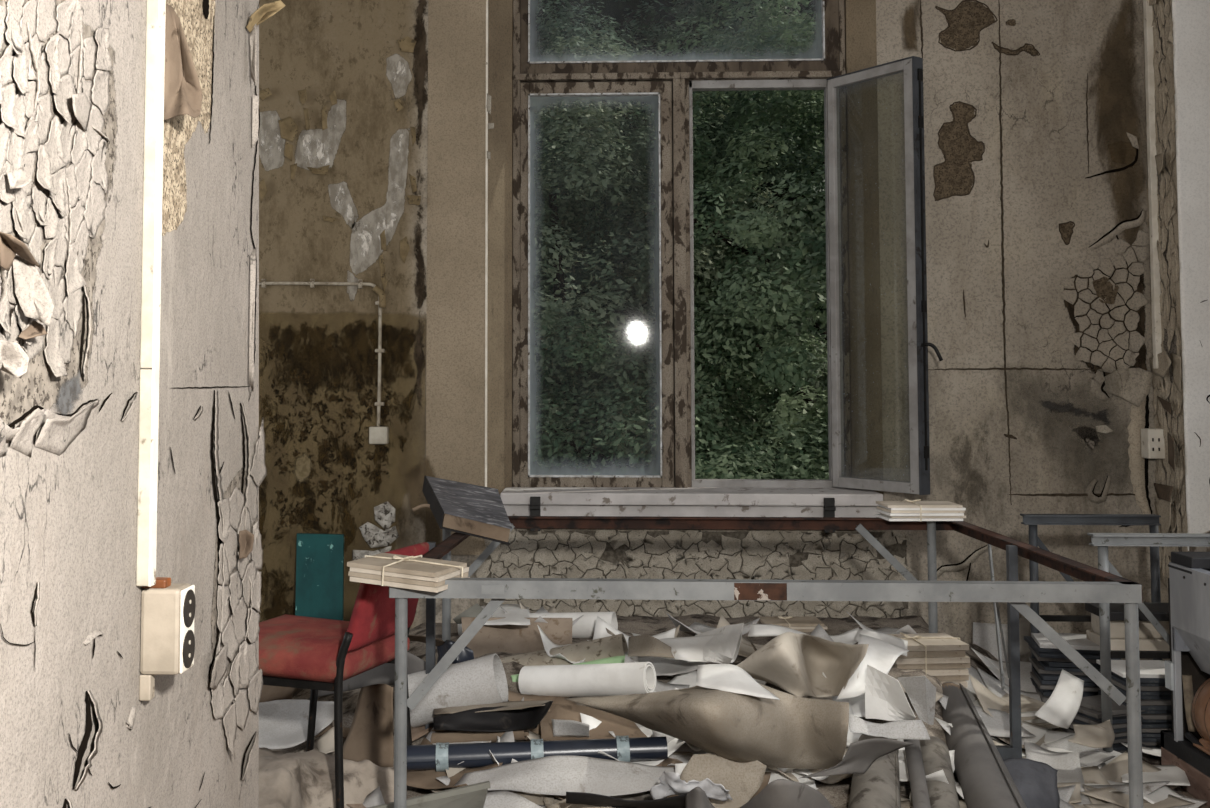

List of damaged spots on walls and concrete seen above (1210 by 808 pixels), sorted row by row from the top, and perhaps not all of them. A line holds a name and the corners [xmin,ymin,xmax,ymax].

peeling [0,0,118,457]
peeling [162,0,216,236]
spalling [933,101,985,201]
spalling [935,0,1040,56]
damp [1089,0,1145,263]
crack [0,582,40,666]
crack [177,85,260,676]
damp [259,313,441,623]
crack [475,528,992,619]
crack [1061,209,1153,527]
crack [63,690,136,808]
crack [241,731,258,781]